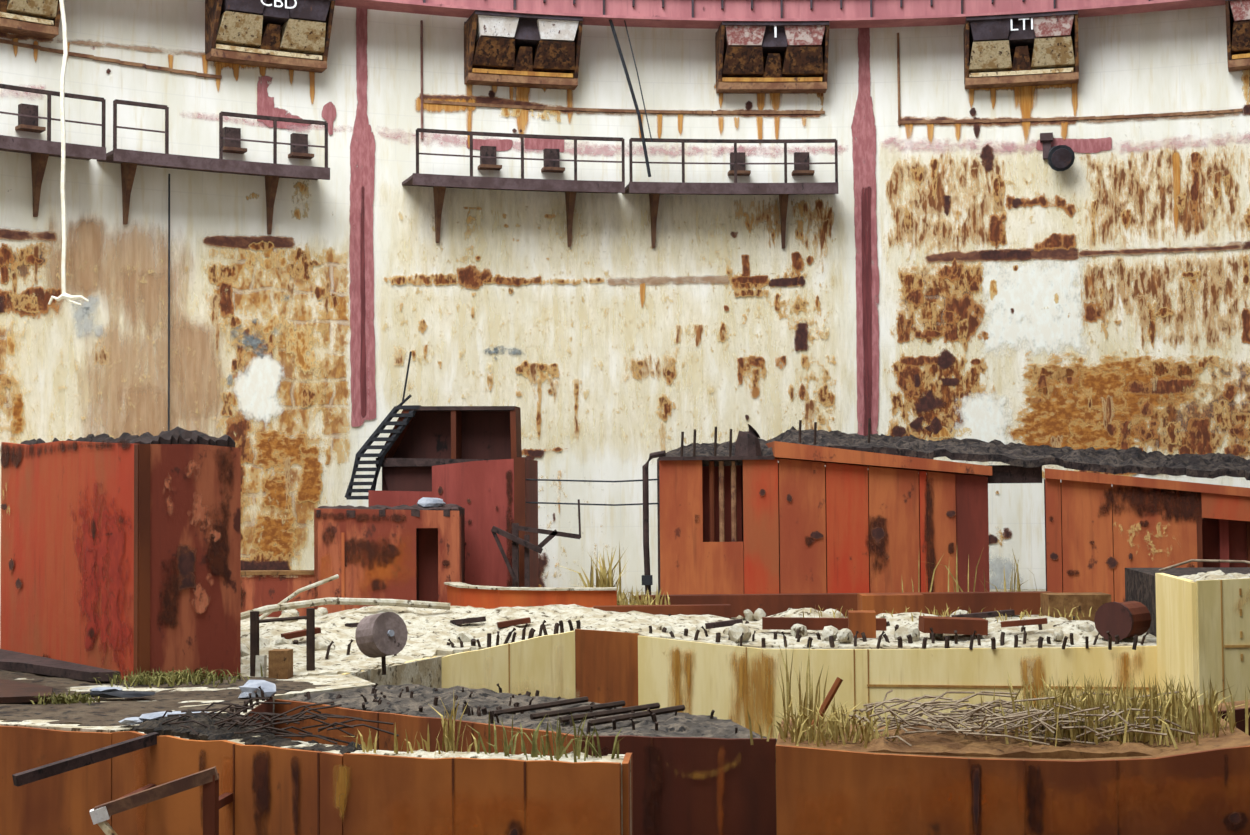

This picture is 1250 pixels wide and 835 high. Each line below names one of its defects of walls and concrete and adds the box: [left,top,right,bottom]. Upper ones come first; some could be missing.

water stain [50,222,284,439]
corrosion [158,235,406,627]
corrosion [291,182,309,219]
corrosion [383,198,836,458]
corrosion [416,84,824,147]
corrosion [886,70,1250,459]